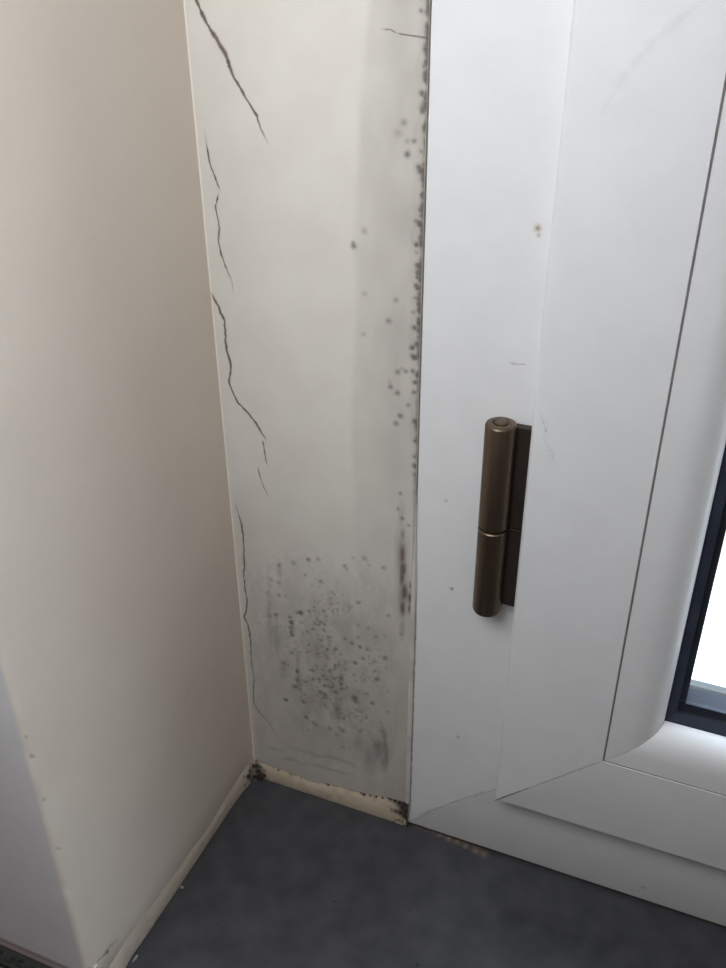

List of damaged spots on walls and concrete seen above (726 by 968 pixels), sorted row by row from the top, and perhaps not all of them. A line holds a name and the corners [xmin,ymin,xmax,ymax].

crack [195,0,263,133]
mould [421,3,429,109]
crack [206,144,230,276]
mould [412,258,422,393]
crack [213,296,266,489]
crack [238,513,265,718]
damp [400,548,411,613]